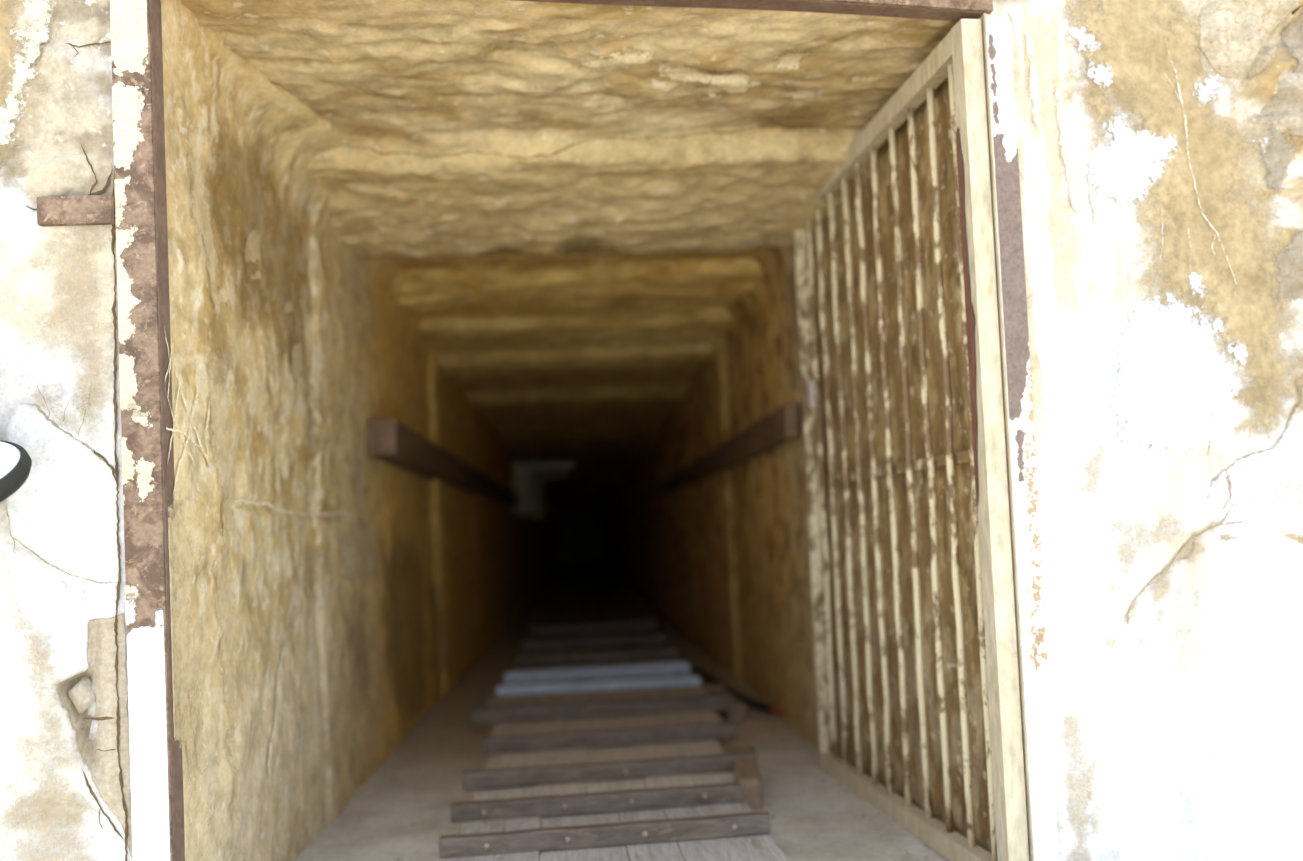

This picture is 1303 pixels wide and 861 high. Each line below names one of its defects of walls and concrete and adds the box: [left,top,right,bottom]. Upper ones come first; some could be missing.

flaking render [0,0,56,145]
flaking render [1067,27,1114,87]
flaking render [1193,74,1223,107]
flaking render [1086,114,1178,218]
leakage [1024,0,1303,433]
corrosion [988,34,1048,671]
crack [1126,383,1303,628]